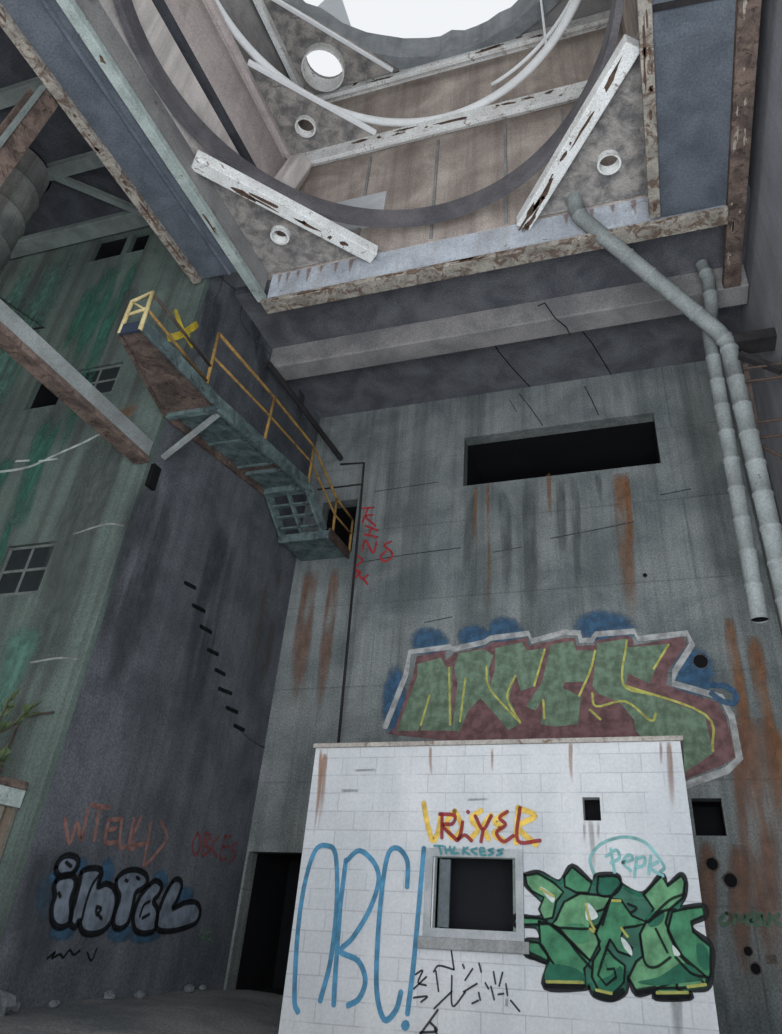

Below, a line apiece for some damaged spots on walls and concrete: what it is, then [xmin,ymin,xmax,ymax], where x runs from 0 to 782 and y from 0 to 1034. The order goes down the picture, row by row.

water stain [6,271,57,328]
water stain [66,265,136,377]
water stain [0,425,57,564]
rust [616,476,632,572]
water stain [0,452,118,710]
rust [296,577,312,675]
rust [727,622,782,952]
rust [699,845,715,936]